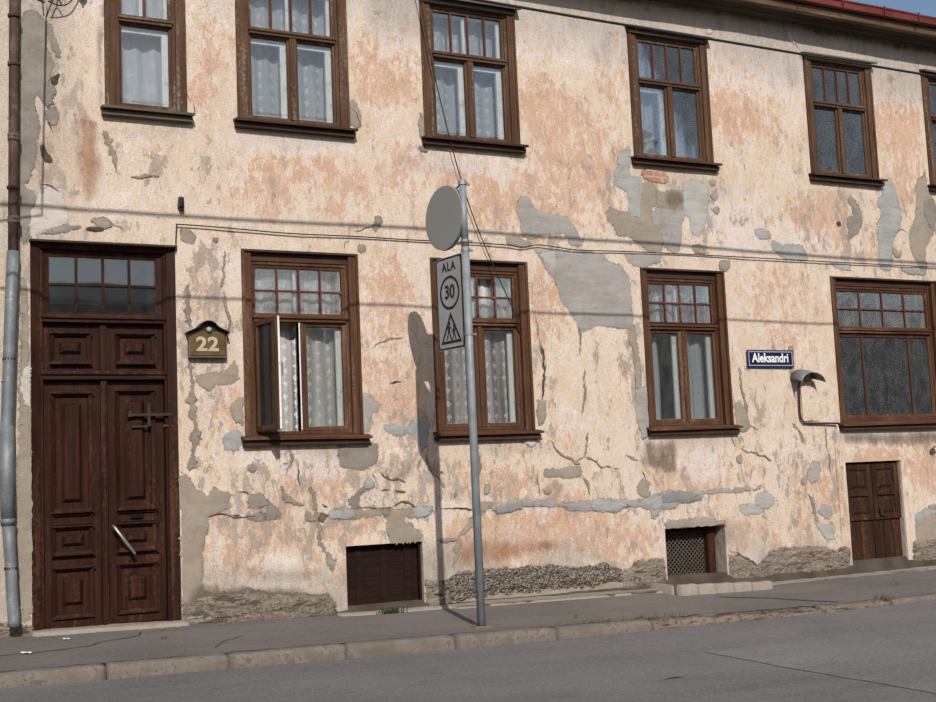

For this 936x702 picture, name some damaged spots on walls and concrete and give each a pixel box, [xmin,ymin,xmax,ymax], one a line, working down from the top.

spalling [18,9,122,245]
spalling [641,167,668,184]
crack [281,310,772,571]
spalling [637,471,651,498]
spalling [178,471,337,624]
spalling [424,558,667,606]
spalling [728,545,851,579]
spalling [912,504,936,561]